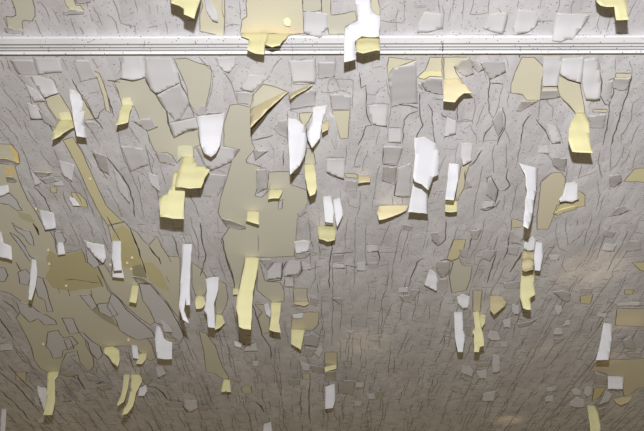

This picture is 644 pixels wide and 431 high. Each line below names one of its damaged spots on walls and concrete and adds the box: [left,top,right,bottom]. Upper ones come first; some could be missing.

crack [35,0,254,145]
crack [107,121,235,285]
peeling [0,56,351,424]
peeling [171,0,225,35]
crack [251,47,317,196]
peeling [240,0,380,62]
crack [0,151,644,431]
crack [322,59,553,216]
peeling [424,229,560,352]
peeling [511,57,607,229]
peeling [596,0,629,20]
crack [598,60,644,187]